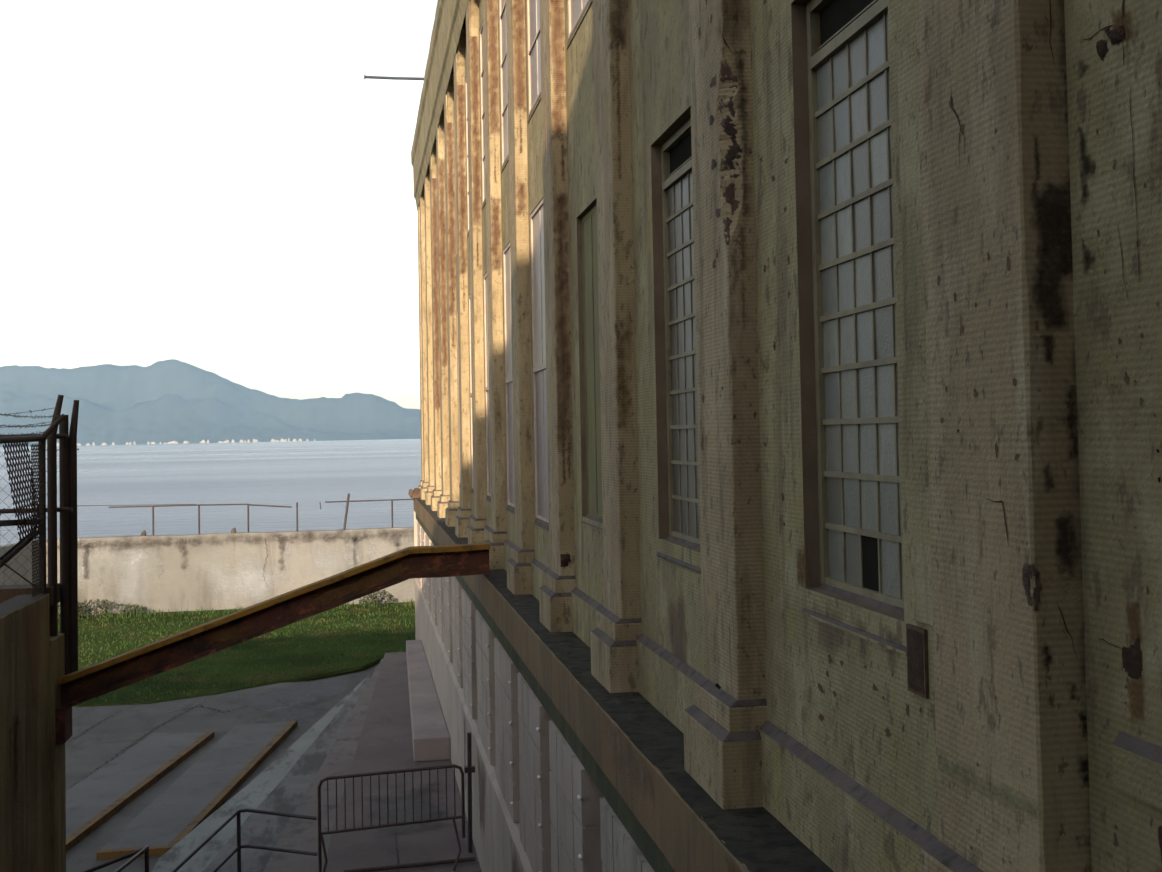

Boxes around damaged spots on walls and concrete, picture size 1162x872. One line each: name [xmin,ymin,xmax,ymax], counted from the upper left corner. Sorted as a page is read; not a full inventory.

spalling [1096,12,1132,60]
spalling [709,48,747,269]
leakage [1033,74,1095,363]
leakage [1056,516,1076,575]
spalling [1022,563,1042,611]